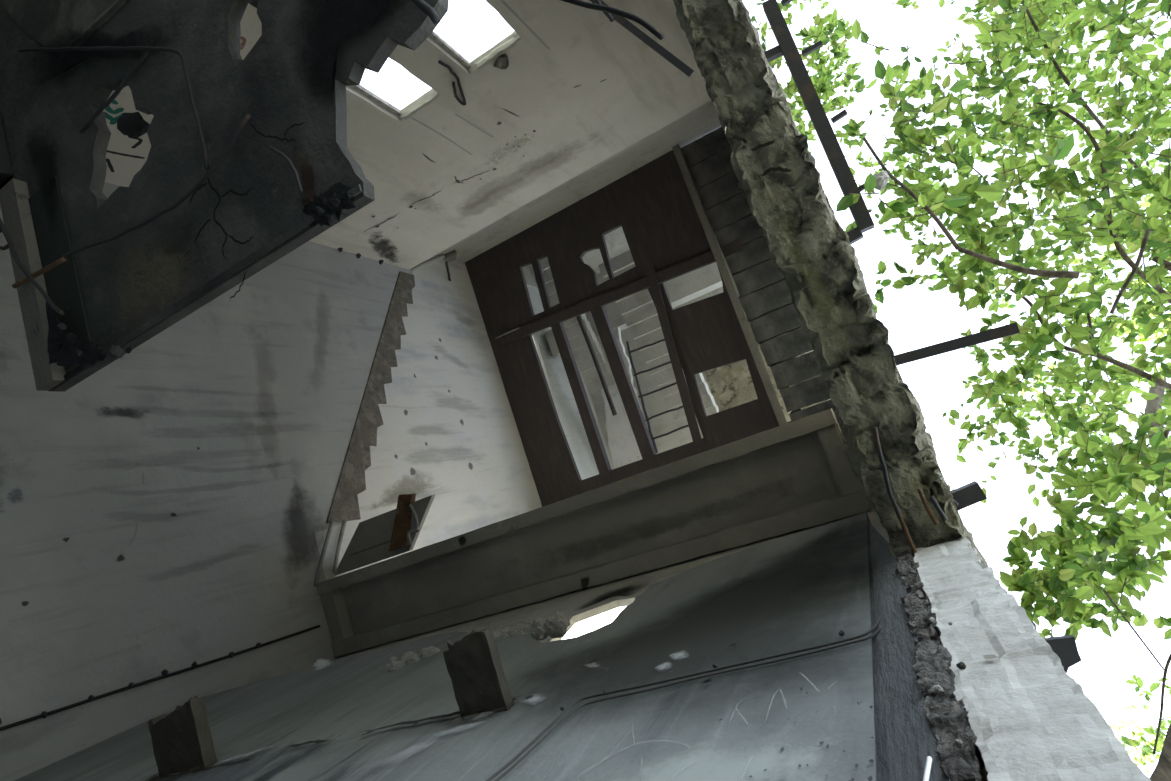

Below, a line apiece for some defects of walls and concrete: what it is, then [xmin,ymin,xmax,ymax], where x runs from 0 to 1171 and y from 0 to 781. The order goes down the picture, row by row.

crack [179,178,253,300]
corrosion [873,427,917,557]
spalling [895,549,986,781]